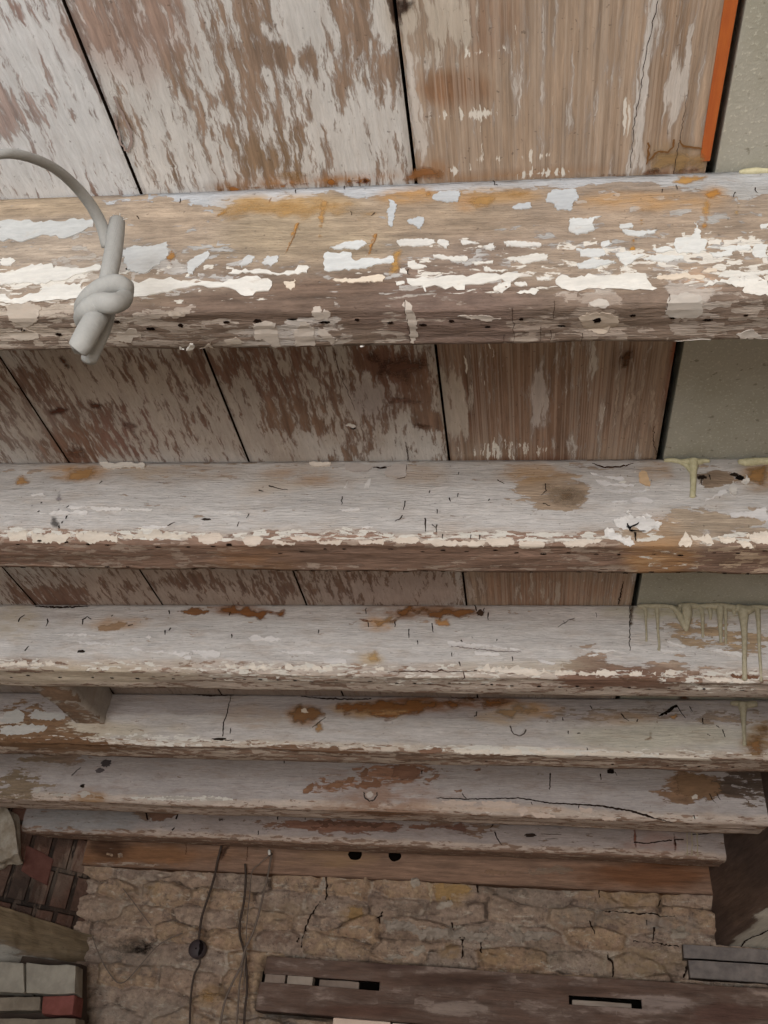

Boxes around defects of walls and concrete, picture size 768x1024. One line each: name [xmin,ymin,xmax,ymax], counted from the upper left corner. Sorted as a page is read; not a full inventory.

crack [630,1,658,168]
peeling [0,218,94,242]
peeling [0,257,101,341]
peeling [122,242,309,297]
peeling [323,216,768,334]
peeling [7,511,243,545]
peeling [359,526,545,549]
peeling [678,506,768,549]
crack [192,694,233,736]
crack [301,694,371,702]
crack [437,773,711,846]
crack [296,877,328,948]